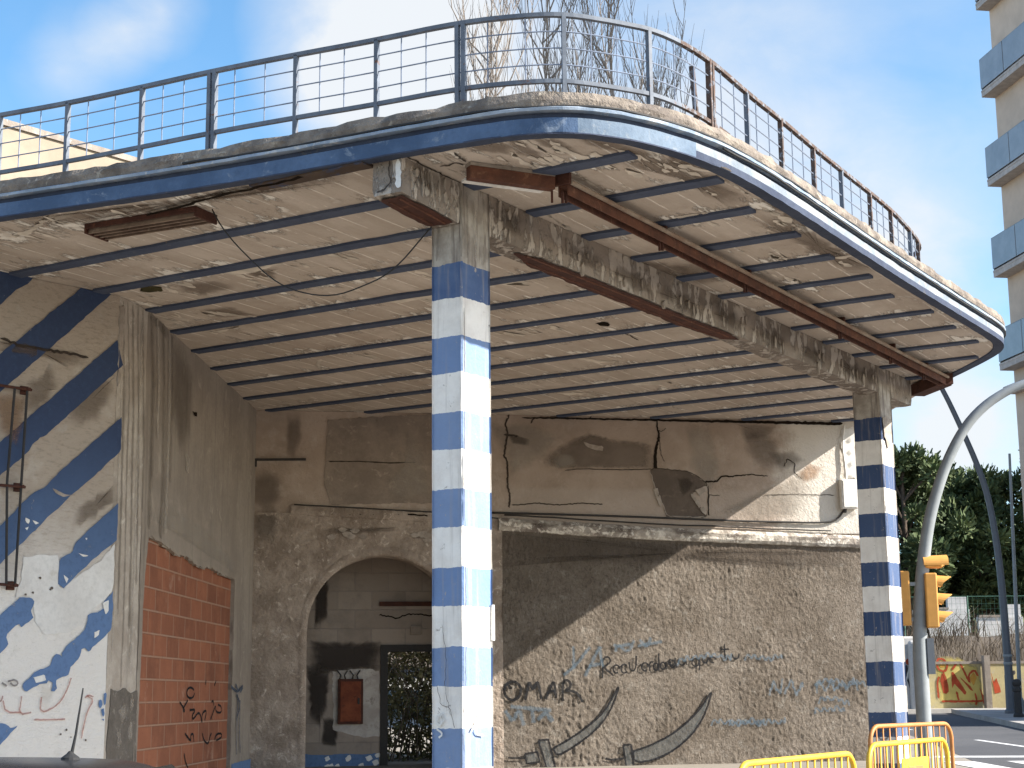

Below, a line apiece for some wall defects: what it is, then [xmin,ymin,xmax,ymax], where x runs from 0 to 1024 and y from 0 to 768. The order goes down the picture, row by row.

peeling [226,260,310,283]
rust [514,253,739,340]
peeling [550,435,707,518]
crack [503,415,843,515]
peeling [16,544,115,635]